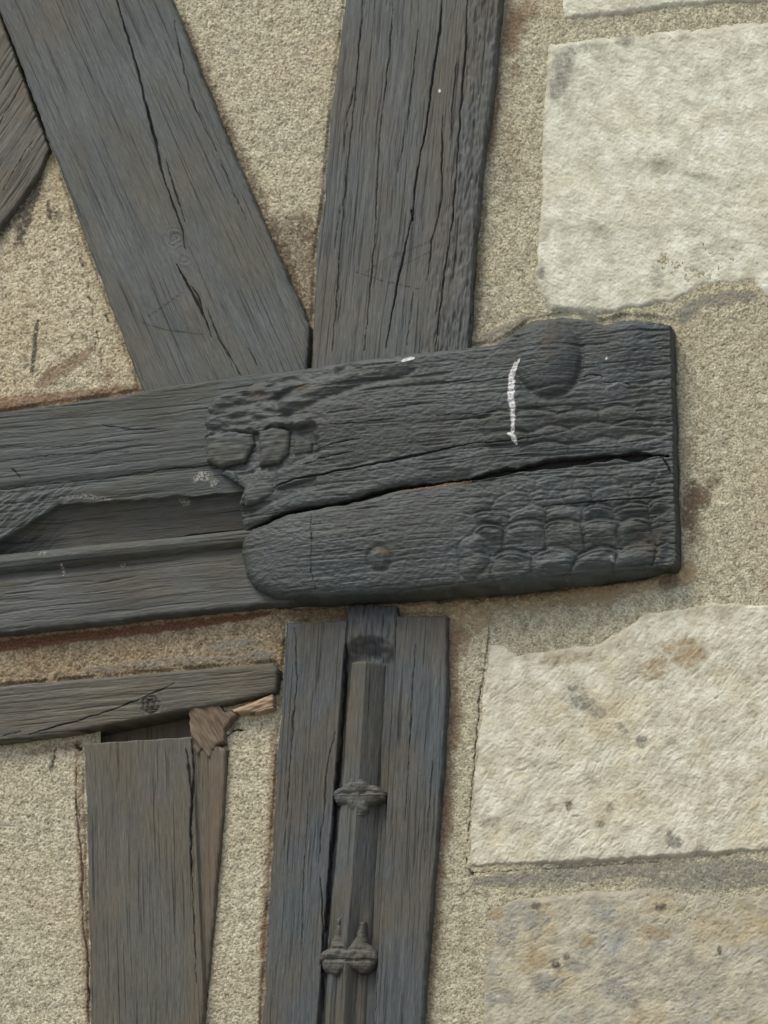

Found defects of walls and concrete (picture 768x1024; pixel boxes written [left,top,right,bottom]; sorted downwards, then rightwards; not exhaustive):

crack [117,0,257,374]
crack [365,0,468,352]
crack [184,453,673,588]
crack [75,768,90,1021]
crack [3,686,169,736]
crack [186,745,197,983]
crack [466,640,562,875]